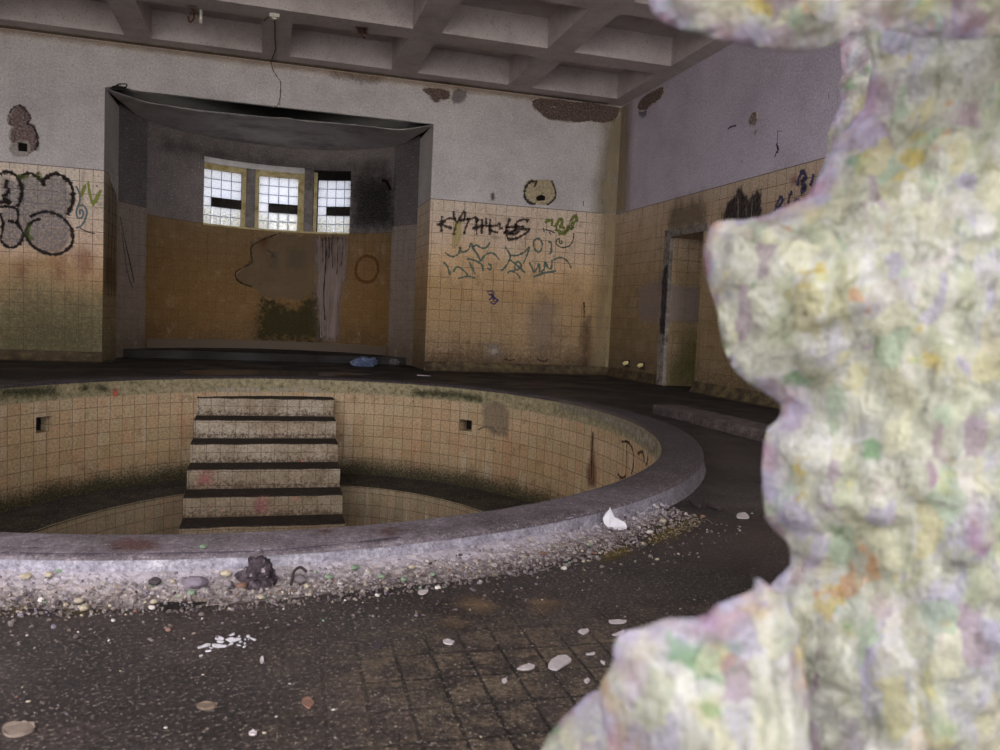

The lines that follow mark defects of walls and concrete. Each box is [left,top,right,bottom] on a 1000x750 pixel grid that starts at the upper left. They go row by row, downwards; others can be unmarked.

spalling [6,104,40,157]
spalling [108,83,430,139]
spalling [422,87,466,103]
spalling [532,97,621,123]
spalling [637,87,665,117]
water stain [350,174,394,229]
water stain [314,236,347,342]